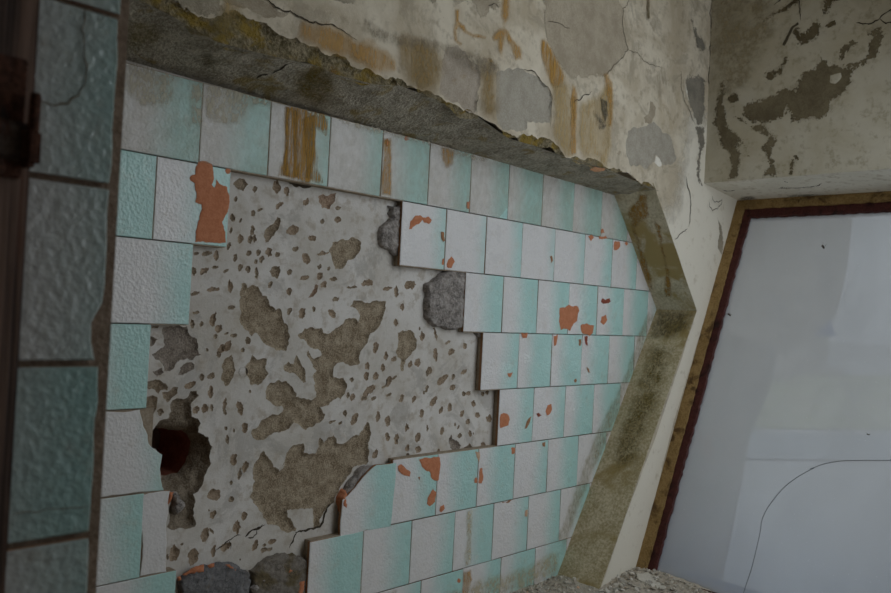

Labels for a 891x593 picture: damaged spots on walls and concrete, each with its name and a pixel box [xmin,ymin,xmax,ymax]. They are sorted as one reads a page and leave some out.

corrosion [281,107,328,182]
crack [267,0,355,39]
spalling [139,0,676,173]
corrosion [494,31,521,58]
corrosion [542,41,564,87]
corrosion [571,75,612,162]
water stain [783,0,838,46]
crack [857,9,891,25]
spalling [146,161,510,553]
peeling [554,305,607,346]
water stain [619,350,666,462]
spalling [166,489,248,566]